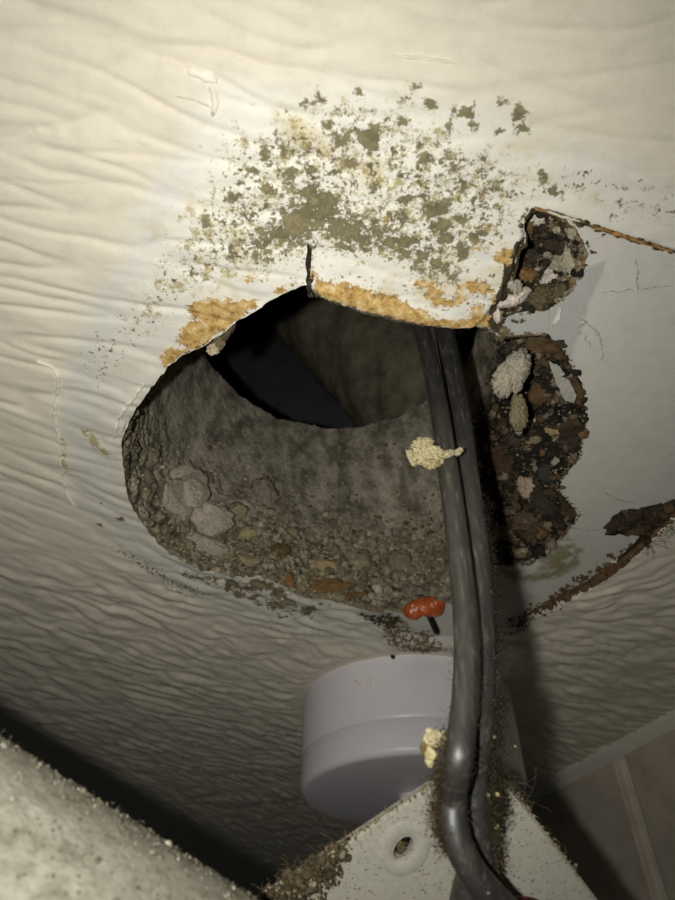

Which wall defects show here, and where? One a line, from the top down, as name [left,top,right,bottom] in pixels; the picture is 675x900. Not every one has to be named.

peeling [156,296,259,367]
leakage [85,82,642,382]
spalling [242,207,596,570]
spalling [603,499,675,548]